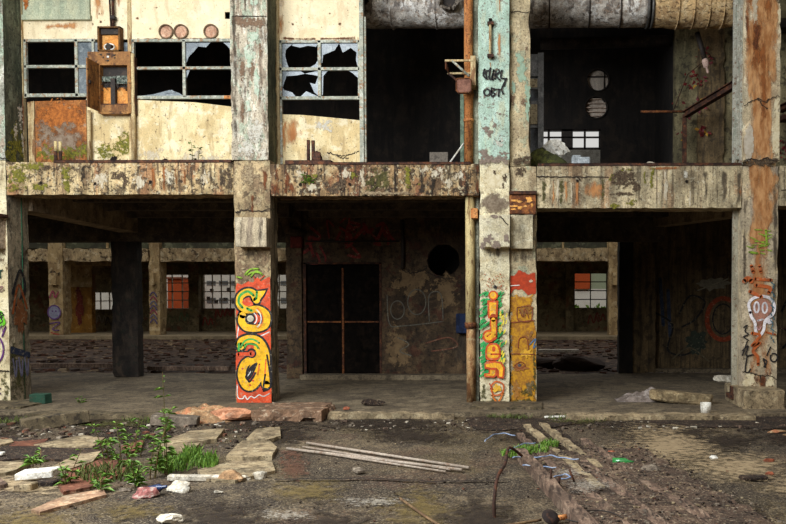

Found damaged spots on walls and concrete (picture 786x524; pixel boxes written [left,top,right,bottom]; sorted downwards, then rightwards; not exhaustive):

peeling [231,17,266,122]
corrosion [35,98,87,130]
crack [744,96,780,109]
corrosion [745,0,779,306]
spalling [322,178,347,194]
water stain [556,179,573,204]